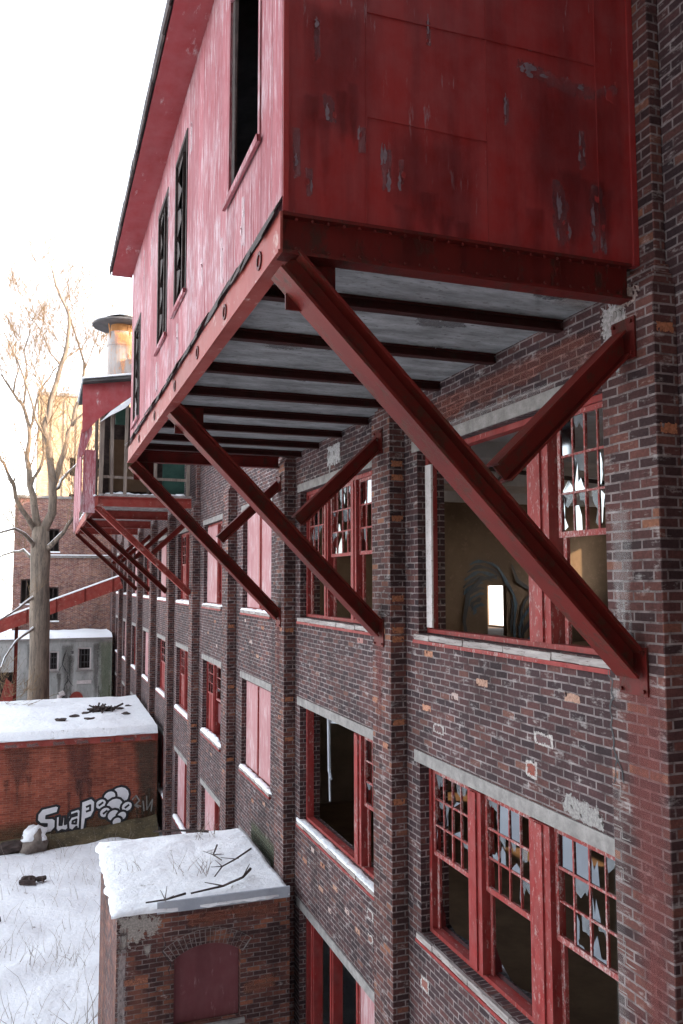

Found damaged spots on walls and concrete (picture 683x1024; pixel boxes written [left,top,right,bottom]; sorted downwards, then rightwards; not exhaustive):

peeling [380,143,406,192]
spalling [115,913,162,954]